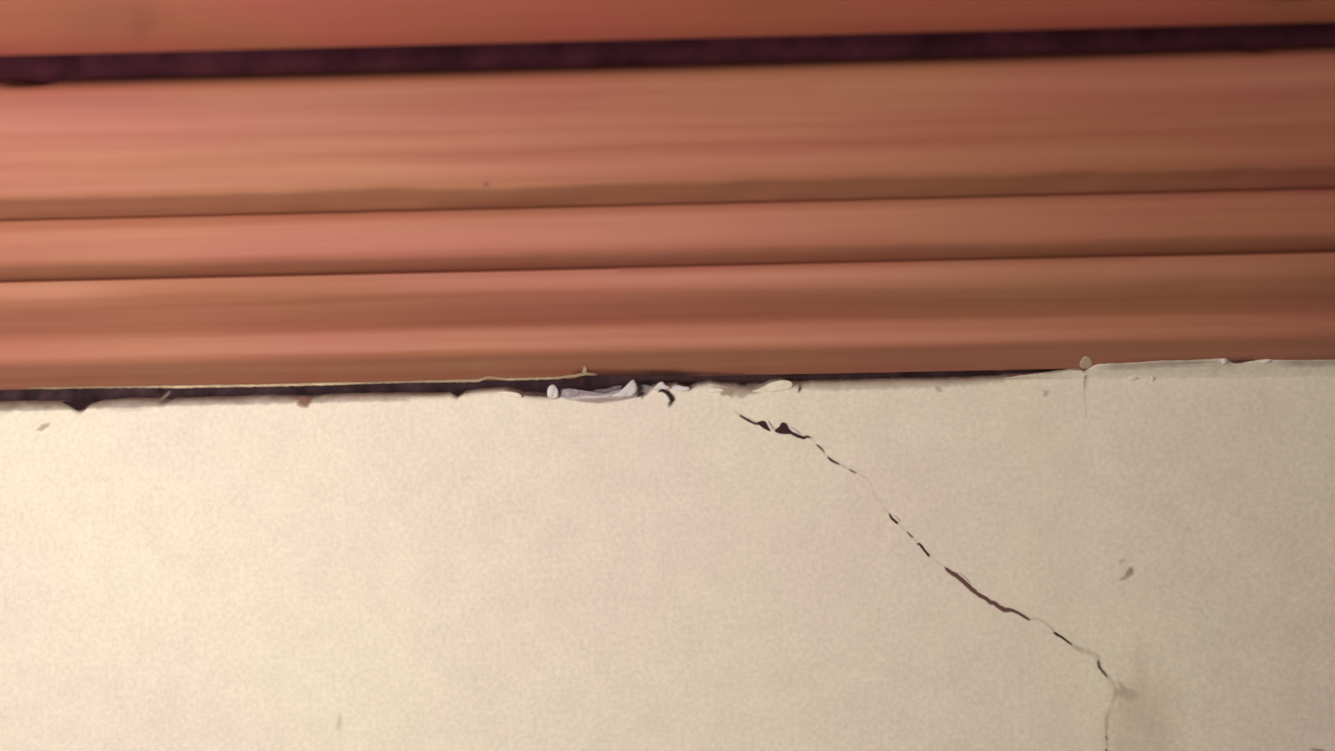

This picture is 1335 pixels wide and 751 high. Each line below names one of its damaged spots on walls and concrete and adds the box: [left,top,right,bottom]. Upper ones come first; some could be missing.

spalling [498,380,725,405]
spalling [752,380,793,392]
crack [741,415,838,464]
crack [889,514,1071,644]